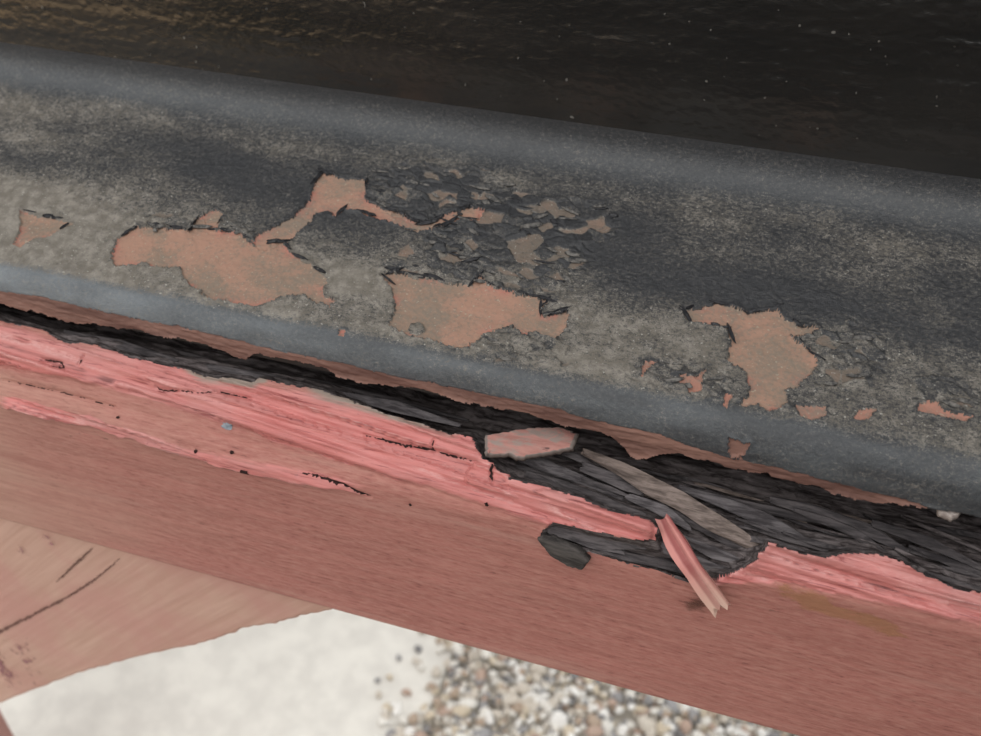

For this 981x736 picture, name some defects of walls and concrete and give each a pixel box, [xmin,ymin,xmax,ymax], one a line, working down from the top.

peeling [13,209,73,248]
peeling [112,154,621,368]
spalling [0,291,981,593]
crack [0,548,120,633]